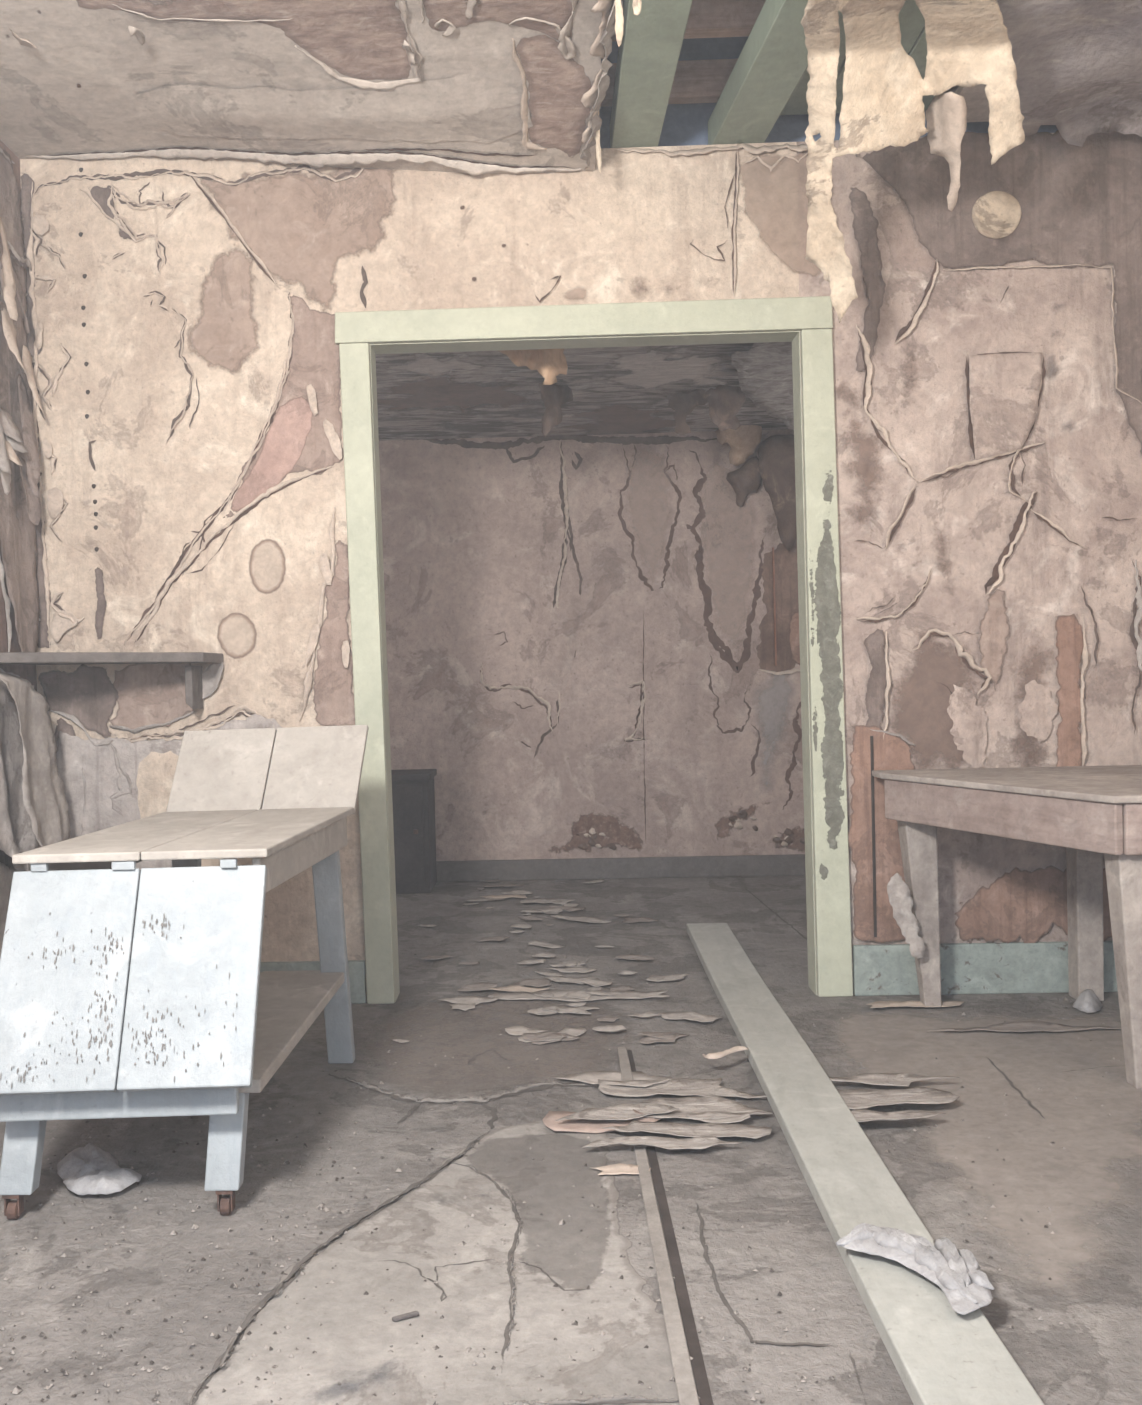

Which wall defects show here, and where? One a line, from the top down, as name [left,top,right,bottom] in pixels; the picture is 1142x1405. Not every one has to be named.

peeling [128,26,145,45]
peeling [31,214,49,235]
peeling [35,321,43,350]
peeling [42,437,52,459]
crack [7,147,581,644]
peeling [306,384,342,460]
crack [417,435,717,608]
crack [856,259,1084,595]
peeling [809,470,845,850]
crack [1081,560,1142,734]
crack [189,1040,636,1405]
crack [512,1145,859,1405]